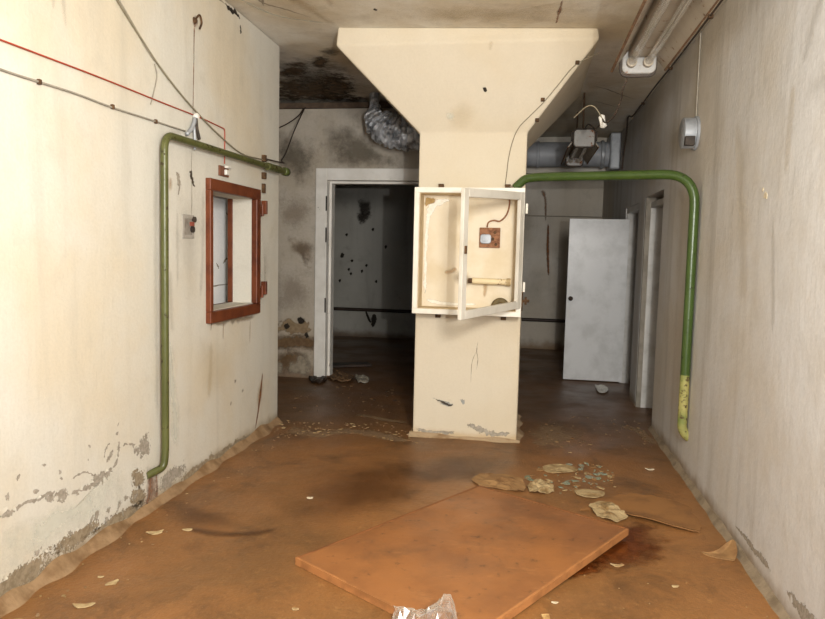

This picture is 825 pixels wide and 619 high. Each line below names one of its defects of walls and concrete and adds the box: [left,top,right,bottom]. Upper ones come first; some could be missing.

water stain [279,50,363,102]
water stain [336,134,380,163]
water stain [278,335,314,374]
spalling [159,434,251,493]
spalling [0,423,151,597]